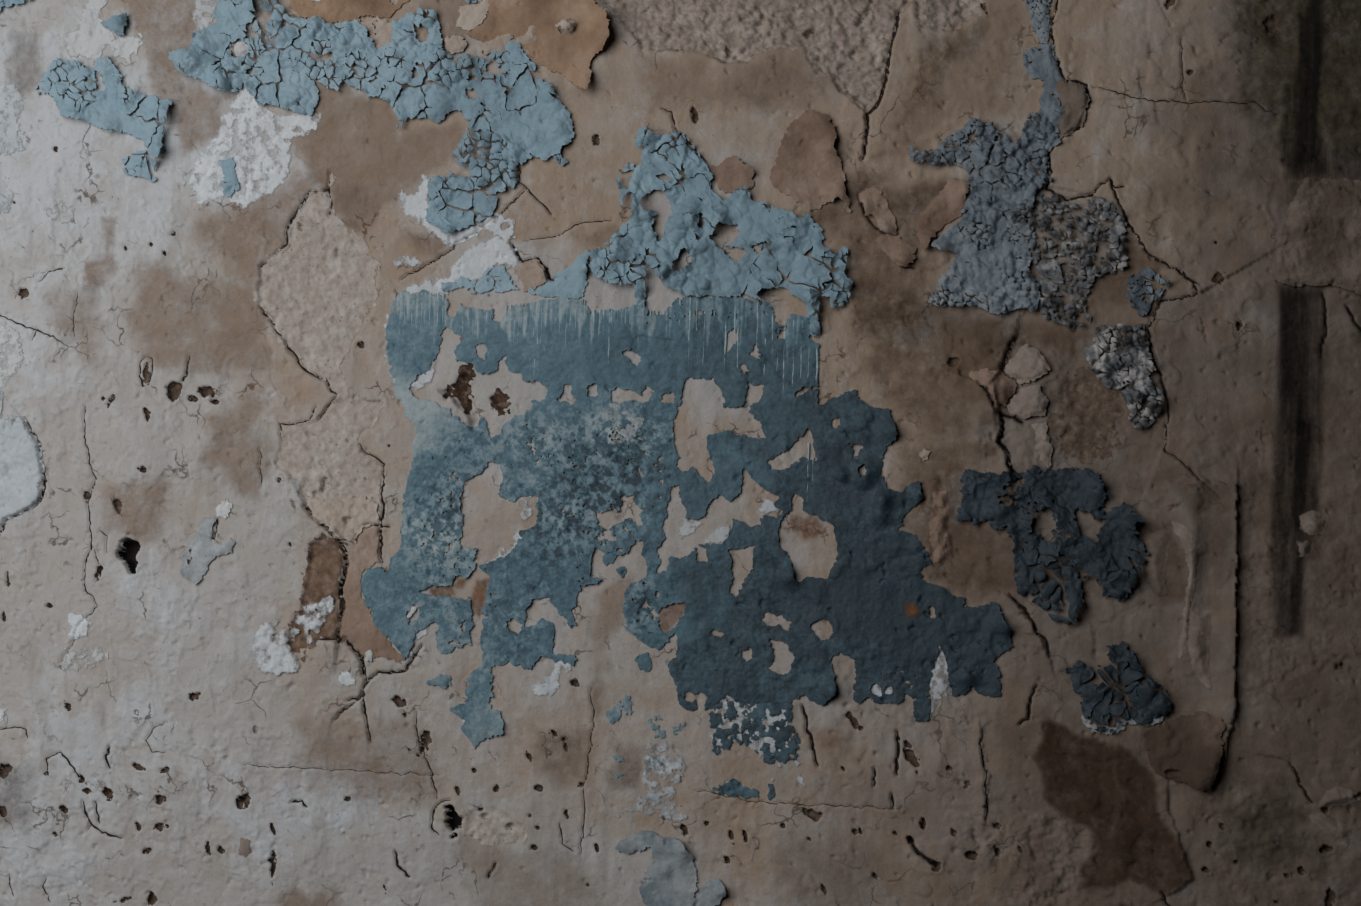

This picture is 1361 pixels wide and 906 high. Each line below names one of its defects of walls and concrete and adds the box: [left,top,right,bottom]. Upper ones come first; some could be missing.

peeling [34,56,173,182]
crack [862,2,908,160]
crack [261,173,333,267]
crack [860,202,886,234]
crack [1046,0,1278,476]
crack [259,306,338,484]
peeling [166,0,1170,800]
peeling [1065,641,1226,793]
peeling [615,818,726,906]
spalling [724,825,748,863]
leakage [1035,722,1192,892]